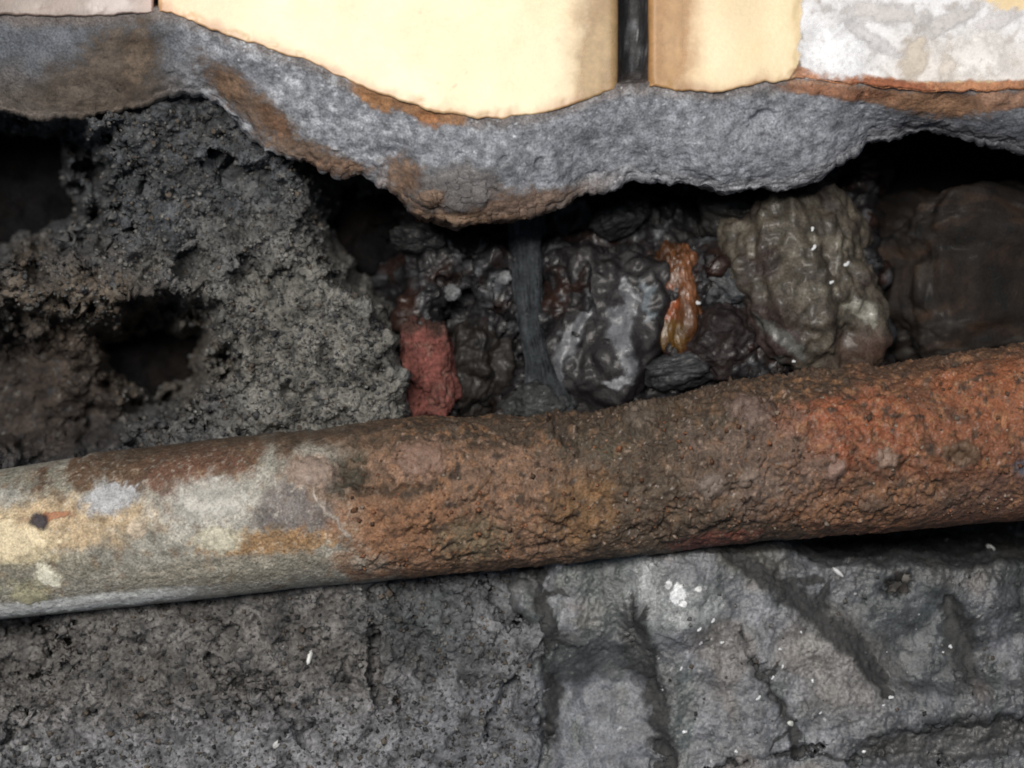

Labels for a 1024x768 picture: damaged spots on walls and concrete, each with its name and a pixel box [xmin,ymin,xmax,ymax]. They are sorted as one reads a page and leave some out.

corrosion [787,67,1024,117]
corrosion [199,58,368,180]
corrosion [660,244,703,354]
corrosion [622,400,658,429]
corrosion [723,393,777,429]
corrosion [697,467,762,501]
corrosion [825,455,846,482]
corrosion [870,447,899,470]
crack [720,549,894,700]
crack [708,626,856,768]